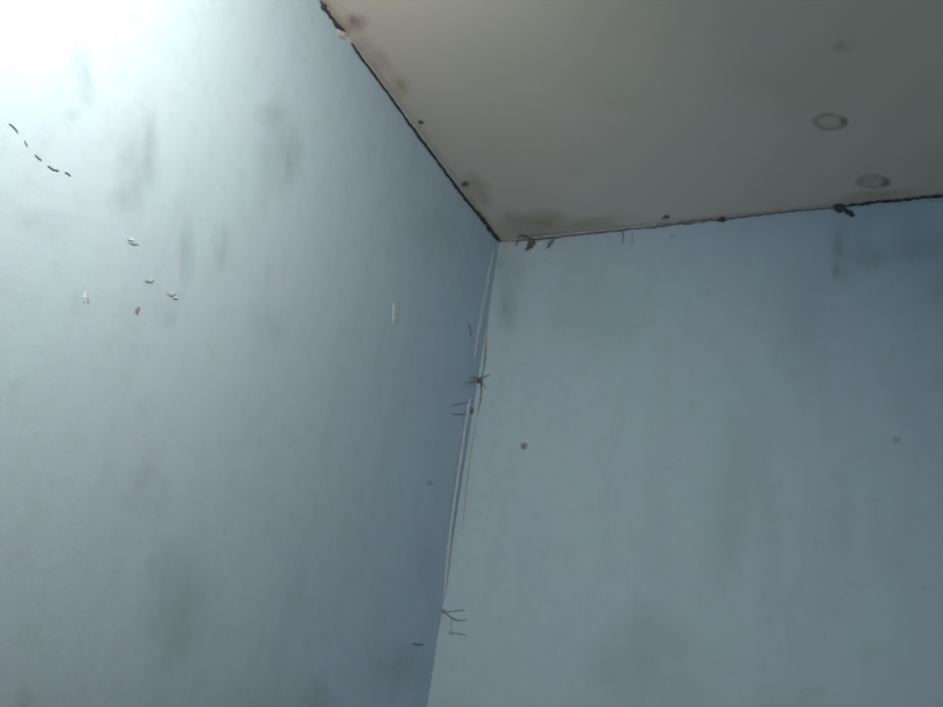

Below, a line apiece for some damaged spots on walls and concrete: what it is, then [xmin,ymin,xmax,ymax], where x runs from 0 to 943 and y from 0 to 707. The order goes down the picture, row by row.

crack [320,0,943,600]